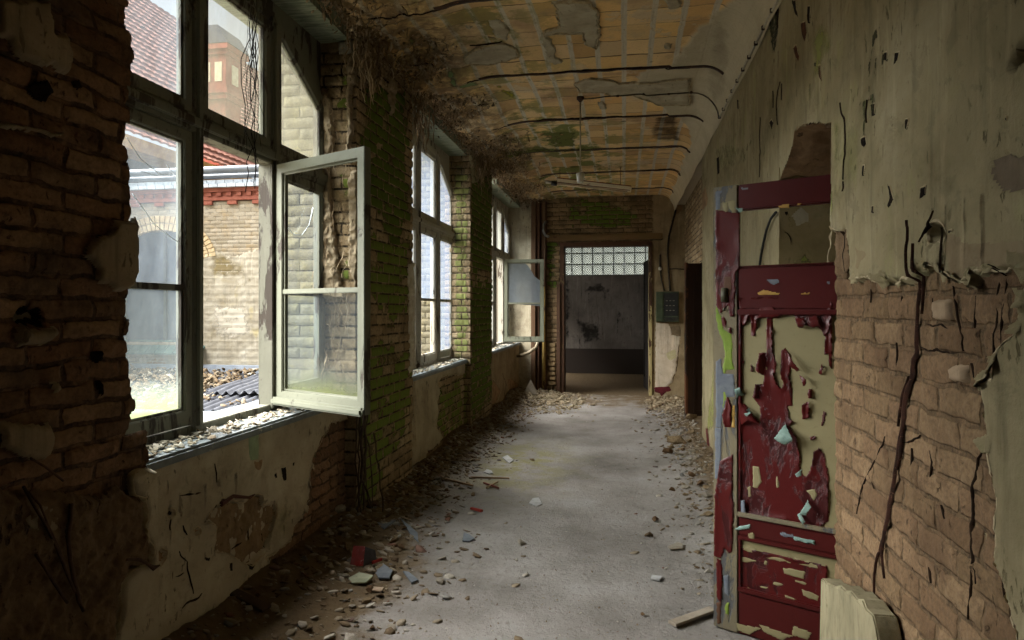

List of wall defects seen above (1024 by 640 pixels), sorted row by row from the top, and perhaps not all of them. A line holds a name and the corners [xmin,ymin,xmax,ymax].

spalling [204,418,348,570]
spalling [705,190,1024,640]
crack [856,210,1008,594]
crack [940,453,983,620]